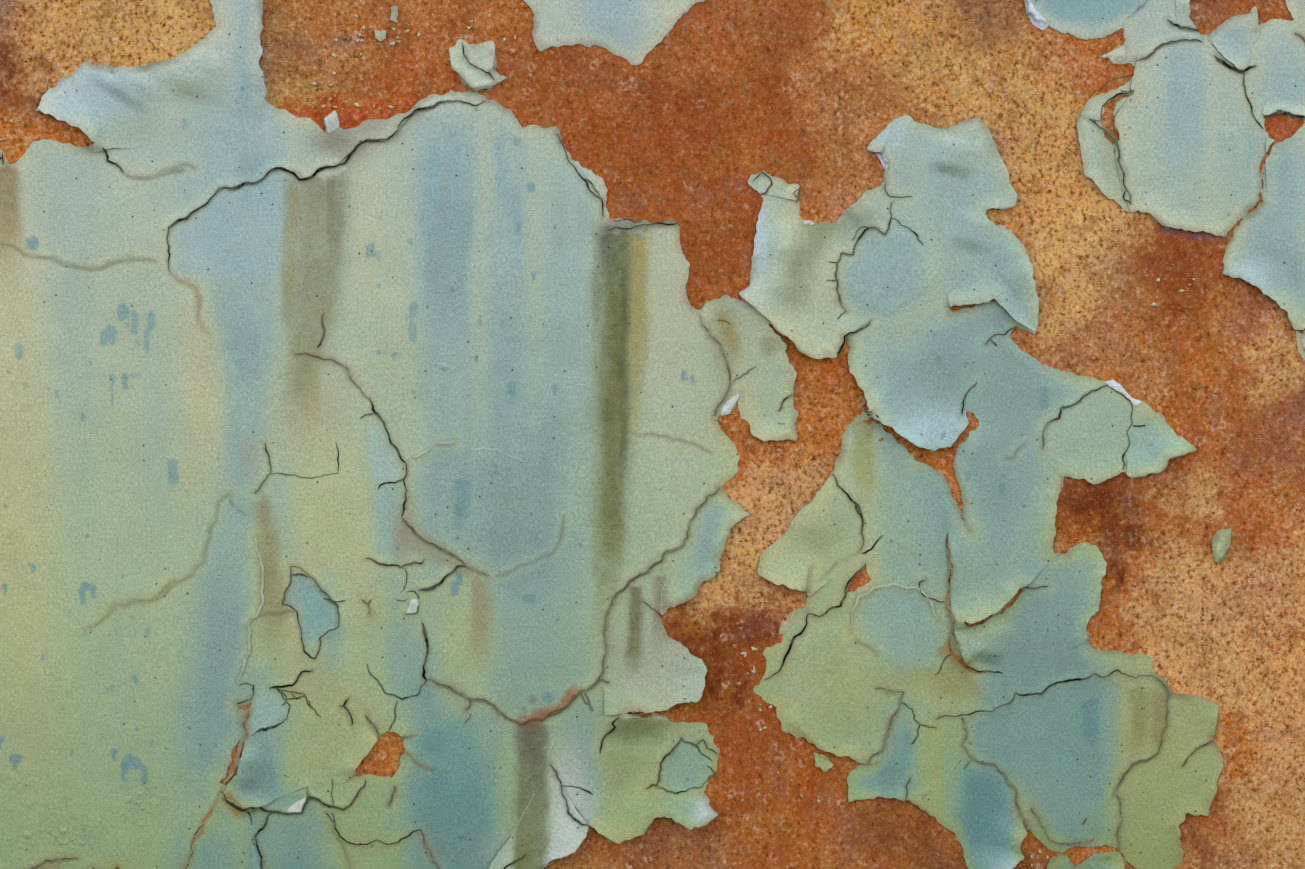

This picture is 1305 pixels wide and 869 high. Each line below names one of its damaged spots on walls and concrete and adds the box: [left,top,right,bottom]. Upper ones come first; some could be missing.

corrosion [0,0,216,233]
peeling [38,0,286,152]
crack [166,43,495,334]
corrosion [614,59,741,172]
peeling [1024,0,1305,360]
damp [0,216,98,639]
damp [165,302,231,501]
crack [183,313,720,869]
damp [401,708,516,856]
corrosion [508,324,979,869]
peeling [701,115,1223,869]
crack [867,532,1213,852]